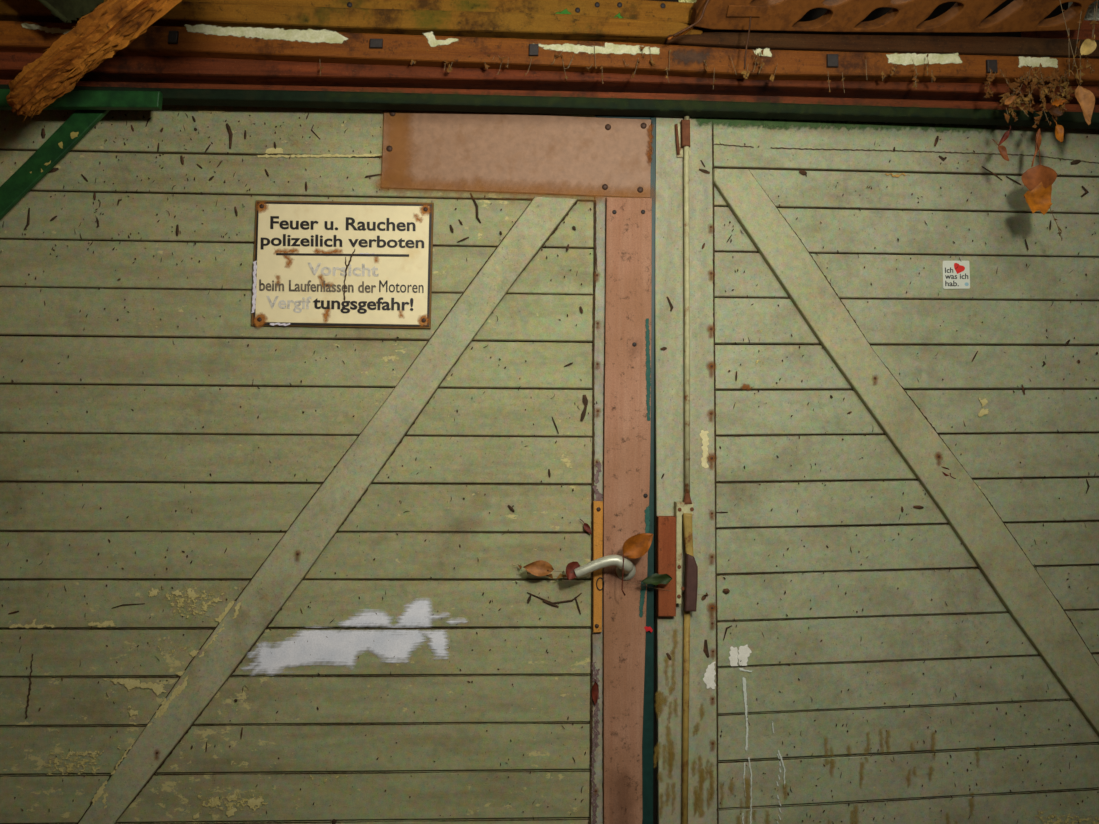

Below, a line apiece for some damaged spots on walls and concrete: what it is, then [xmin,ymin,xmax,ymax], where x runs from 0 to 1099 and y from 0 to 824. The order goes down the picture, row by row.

peeling [88,620,117,628]
peeling [148,587,241,658]
peeling [104,671,189,726]
corrosion [654,630,677,815]
peeling [38,743,134,809]
peeling [193,791,272,819]
corrosion [692,757,769,824]